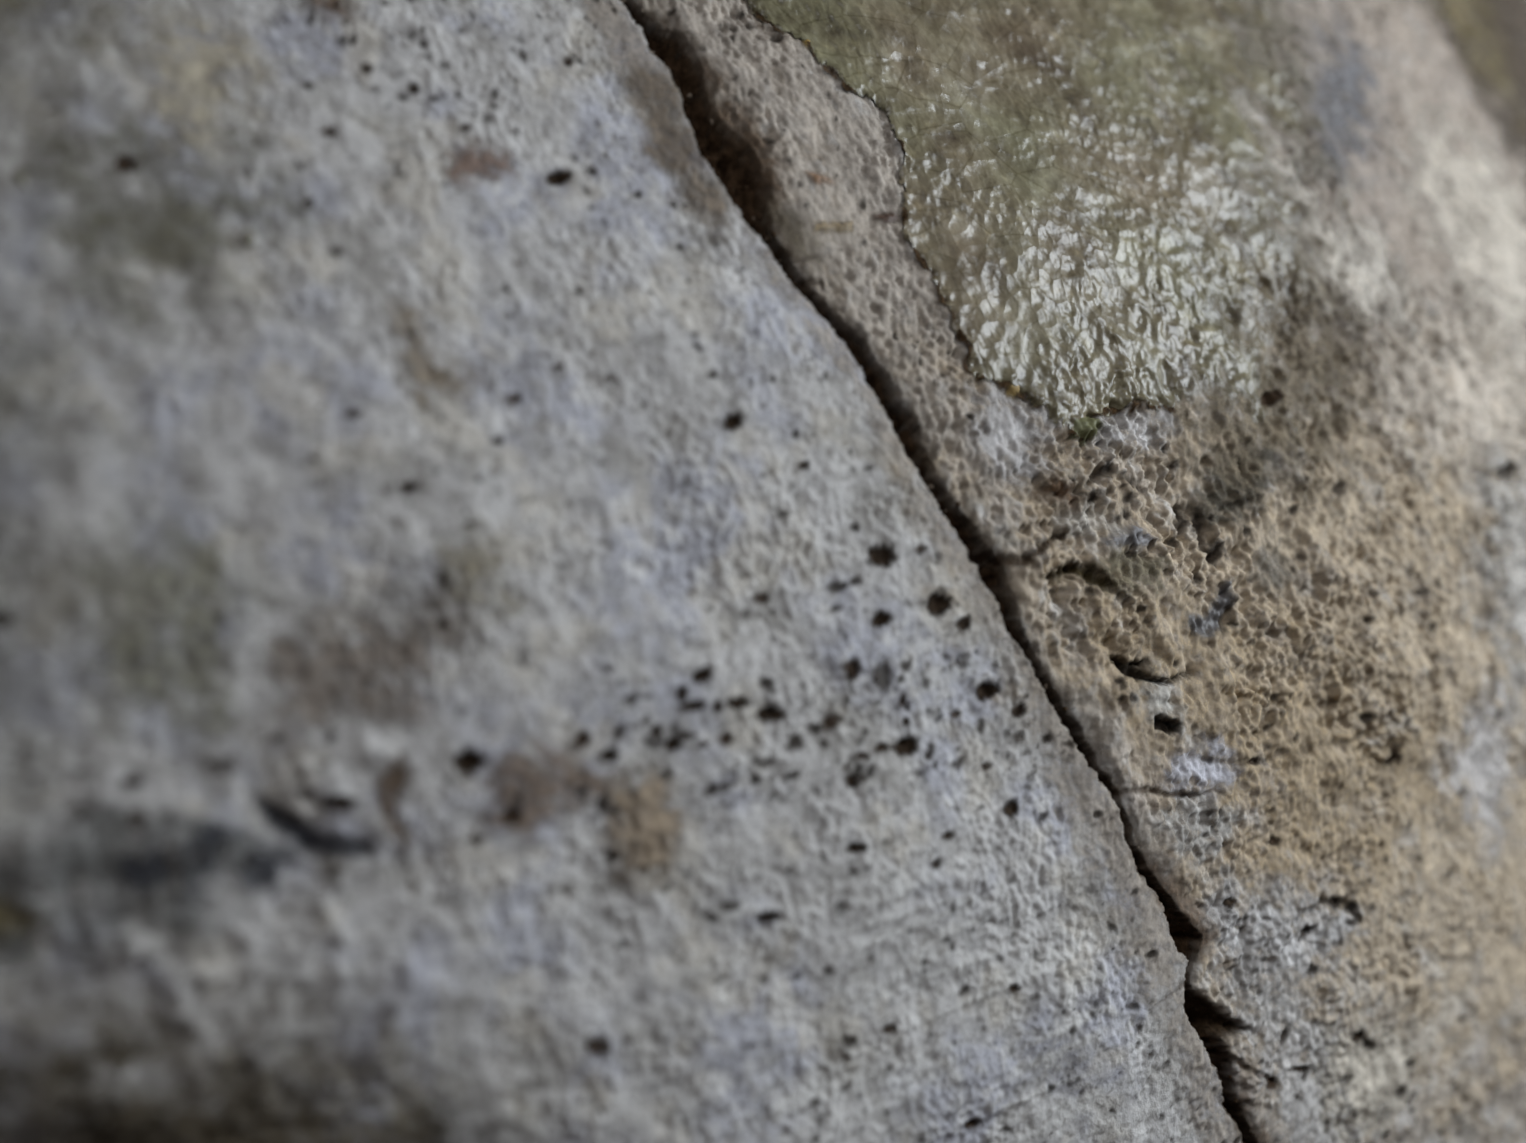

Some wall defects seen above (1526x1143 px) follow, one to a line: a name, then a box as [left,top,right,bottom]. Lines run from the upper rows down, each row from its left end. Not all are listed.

spalling [546,169,572,185]
peeling [653,0,1176,495]
spalling [867,543,897,567]
crack [619,0,1268,1143]
spalling [872,610,894,627]
spalling [922,587,971,631]
spalling [1109,656,1176,685]
spalling [677,665,786,722]
spalling [843,659,920,787]
spalling [976,682,1001,733]
spalling [1154,715,1180,735]
spalling [1003,799,1019,819]